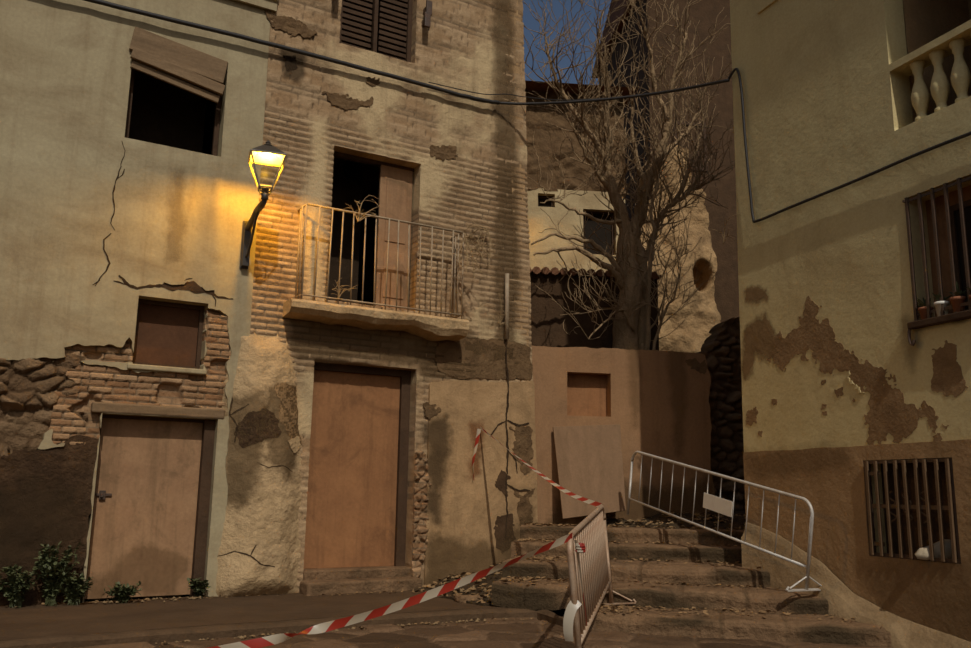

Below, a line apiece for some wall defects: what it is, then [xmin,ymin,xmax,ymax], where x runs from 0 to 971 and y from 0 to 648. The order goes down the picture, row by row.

crack [93,142,233,307]
spalling [162,278,215,296]
flaking render [0,309,231,457]
peeling [742,296,949,445]
peeling [931,340,968,397]